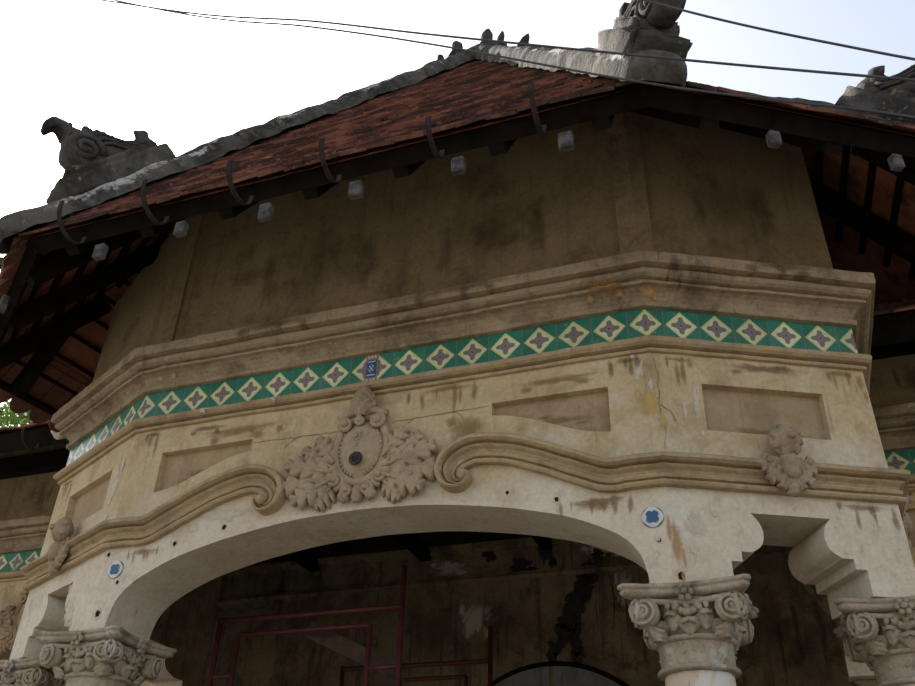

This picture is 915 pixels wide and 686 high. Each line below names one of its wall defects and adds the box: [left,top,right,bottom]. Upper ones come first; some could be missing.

crack [394,406,486,423]
crack [653,357,676,449]
peeling [546,546,620,664]